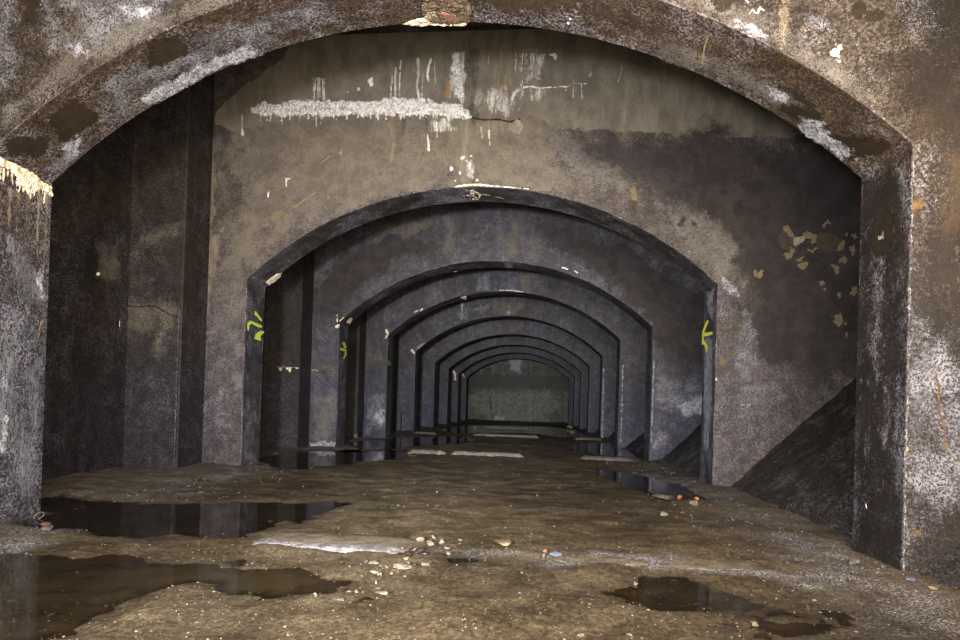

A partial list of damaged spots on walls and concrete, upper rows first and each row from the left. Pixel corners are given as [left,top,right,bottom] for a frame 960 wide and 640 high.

spalling [404,0,472,27]
water stain [0,0,333,504]
peeling [778,219,859,274]
water stain [207,29,960,572]
peeling [832,313,848,338]